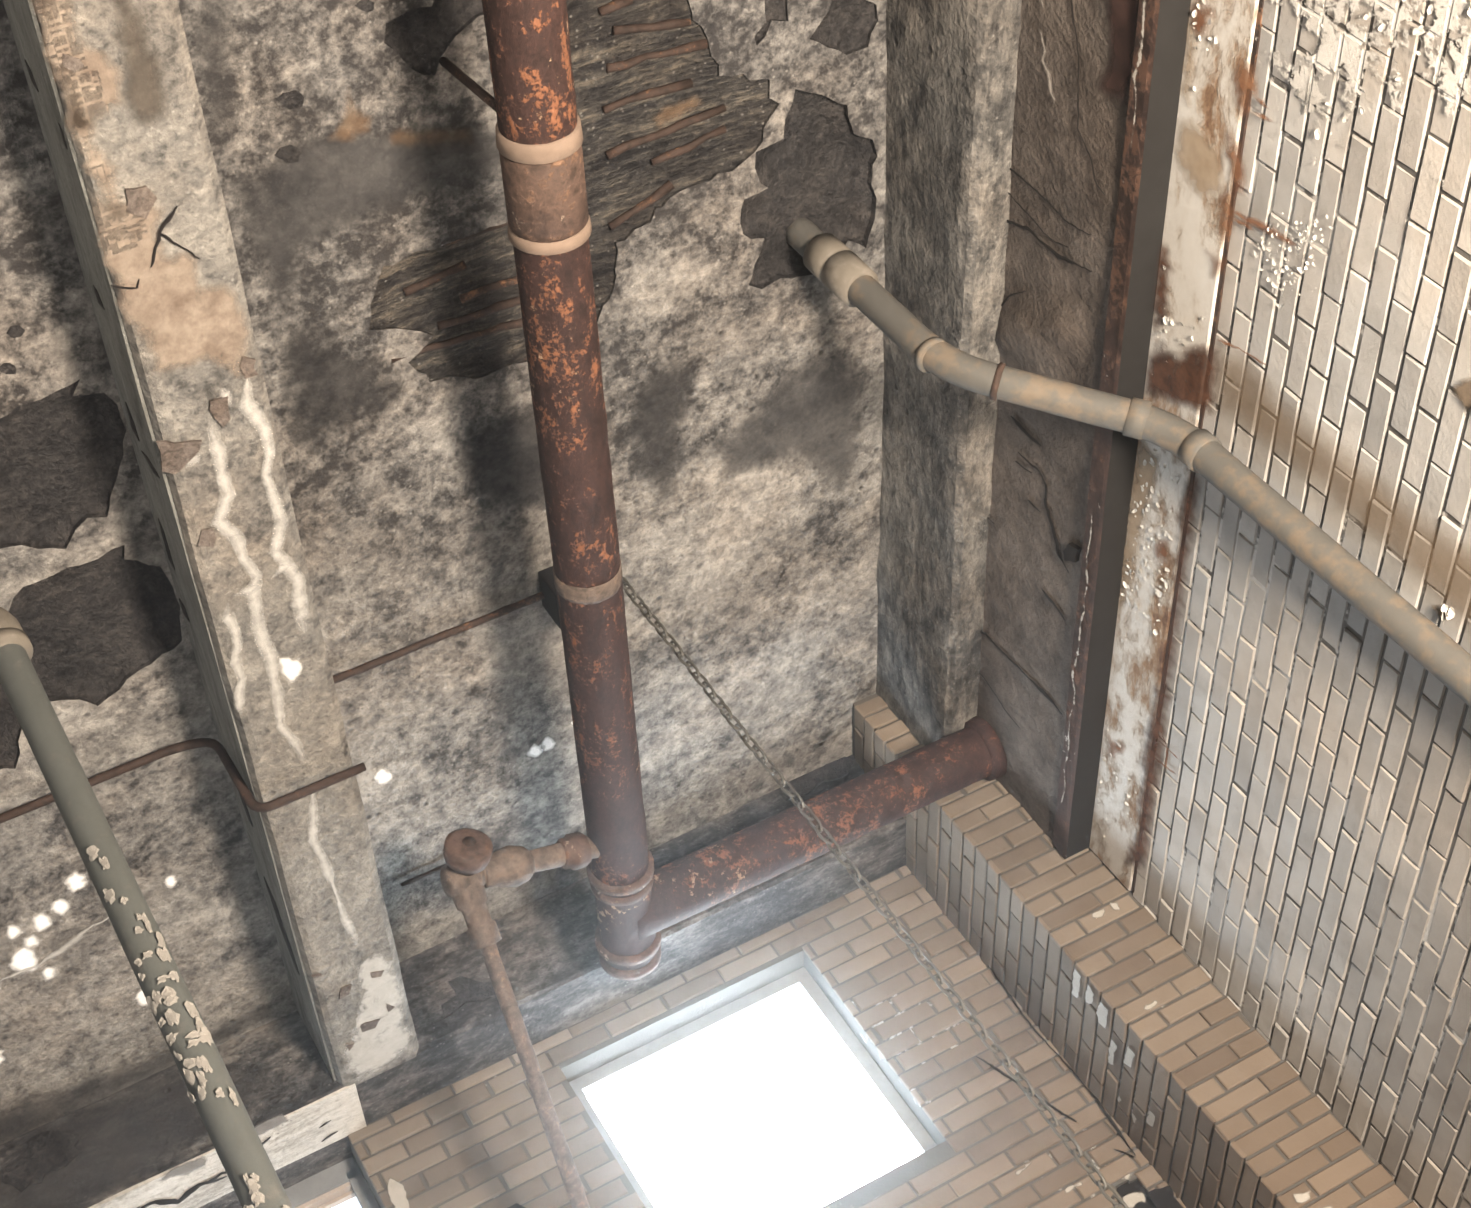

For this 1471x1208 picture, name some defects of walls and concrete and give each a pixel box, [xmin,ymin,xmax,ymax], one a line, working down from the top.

spalling [566,0,878,322]
rust [1102,0,1139,100]
peeling [1255,0,1471,167]
crack [110,206,200,289]
rust [1154,248,1170,324]
rust [1147,340,1266,413]
spalling [0,379,126,549]
damp [222,380,307,624]
spalling [9,545,182,706]
damp [189,431,302,755]
crack [137,1171,227,1208]
crack [319,1120,338,1142]